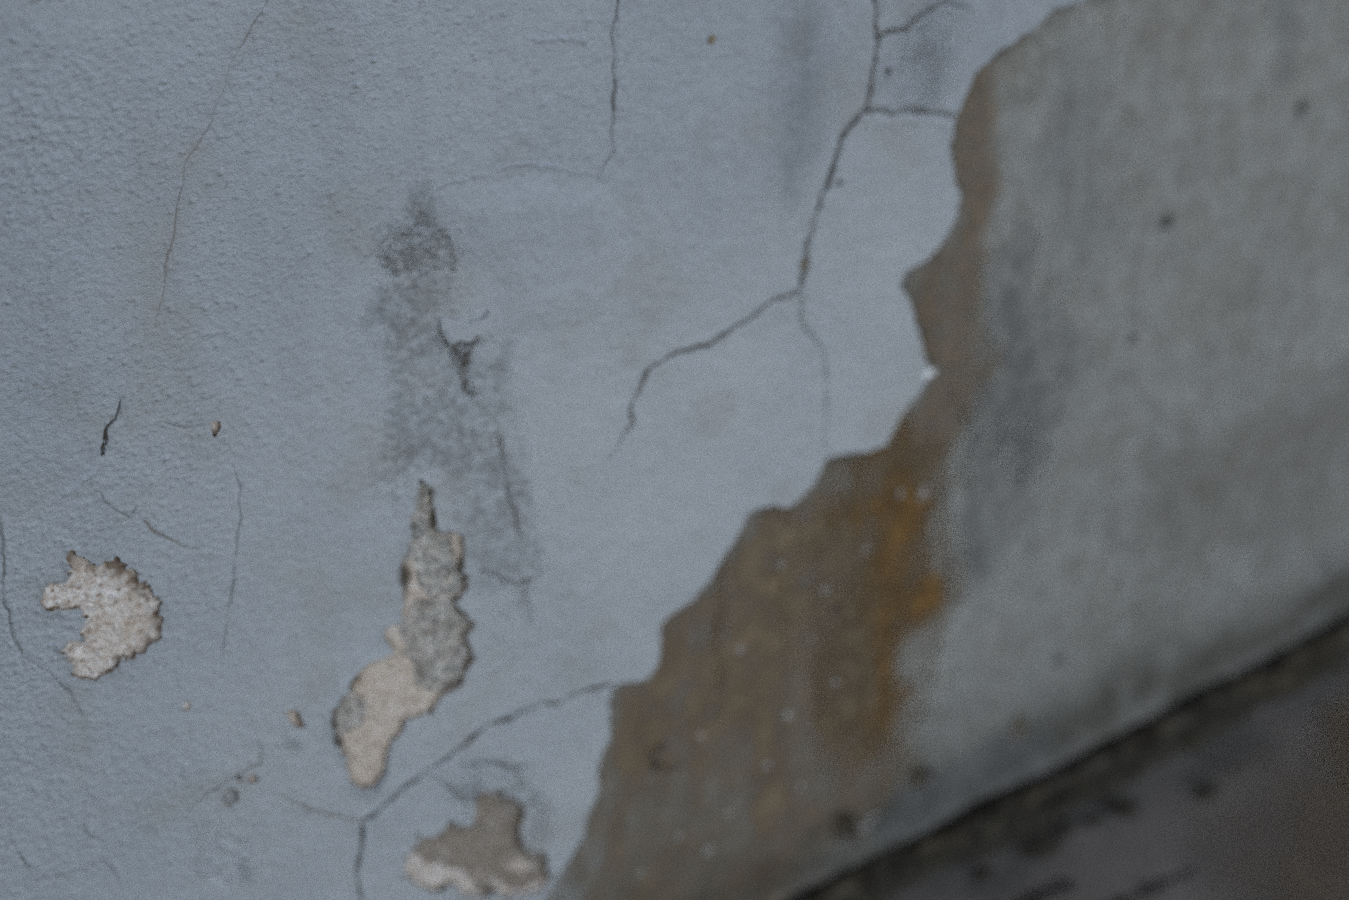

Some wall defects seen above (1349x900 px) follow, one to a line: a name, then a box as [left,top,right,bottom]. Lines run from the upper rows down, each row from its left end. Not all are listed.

crack [598,75,616,178]
crack [619,0,969,450]
crack [55,400,121,500]
spalling [402,0,1349,900]
peeling [39,550,164,681]
peeling [331,479,476,789]
crack [303,683,612,900]
damp [605,441,943,872]